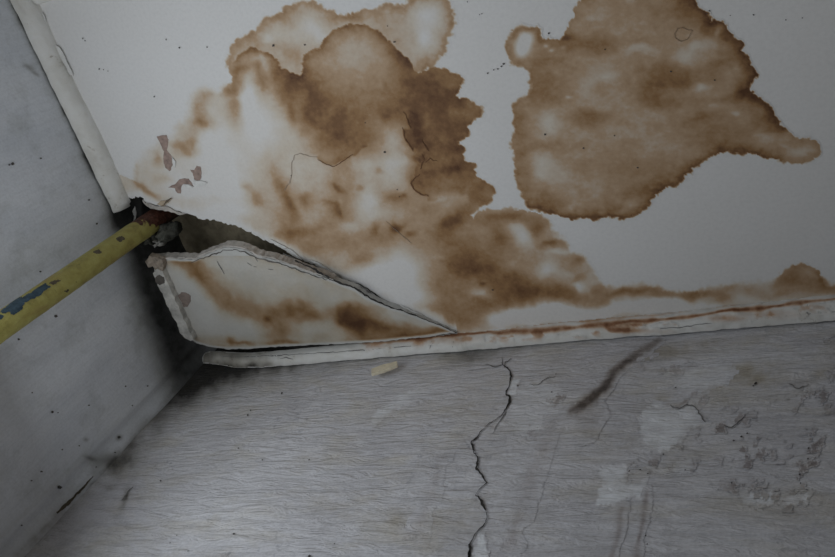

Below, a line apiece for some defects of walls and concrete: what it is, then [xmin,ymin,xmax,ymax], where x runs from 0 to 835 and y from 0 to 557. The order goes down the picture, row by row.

peeling [157,135,176,171]
damp [0,0,835,333]
peeling [178,292,191,307]
damp [0,235,653,557]
rust [355,296,835,354]
damp [627,320,835,422]
crack [468,358,553,557]